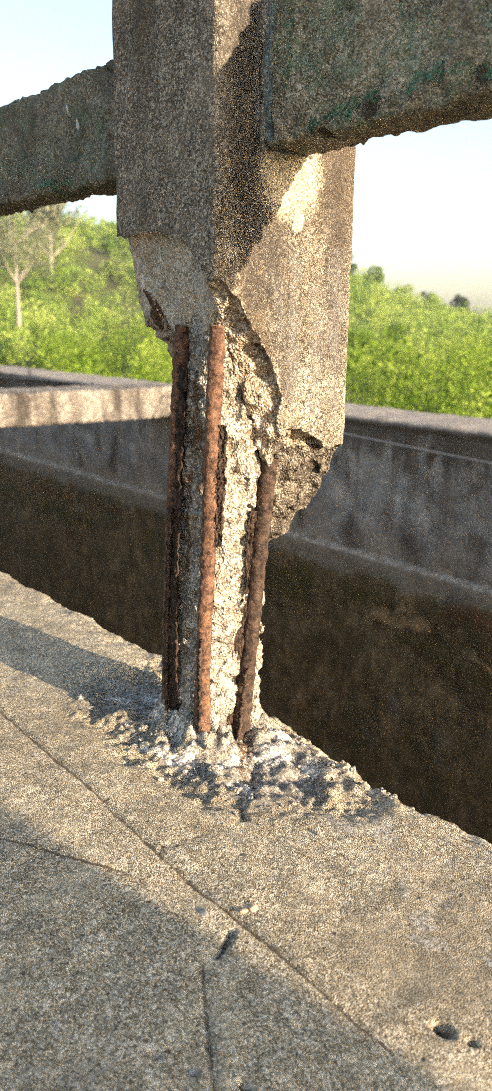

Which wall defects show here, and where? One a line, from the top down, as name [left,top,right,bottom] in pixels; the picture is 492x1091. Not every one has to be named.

corrosion [182,371,204,573]
spalling [69,231,439,820]
crack [0,711,394,1056]
spalling [461,831,492,847]
crack [201,966,216,1091]